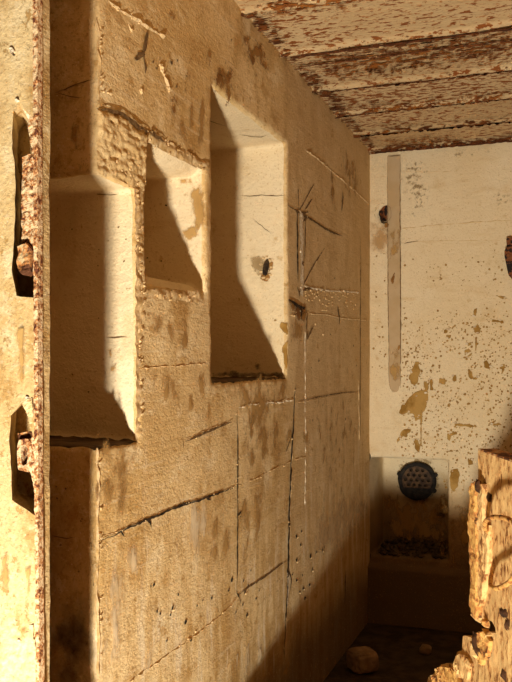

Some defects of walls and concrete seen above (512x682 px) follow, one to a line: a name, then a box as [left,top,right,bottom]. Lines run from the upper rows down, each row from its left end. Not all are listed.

peeling [183,188,204,240]
spalling [252,256,273,281]
crack [297,248,325,296]
spalling [134,189,201,441]
peeling [464,325,480,358]
peeling [397,362,456,471]
crack [98,270,361,654]